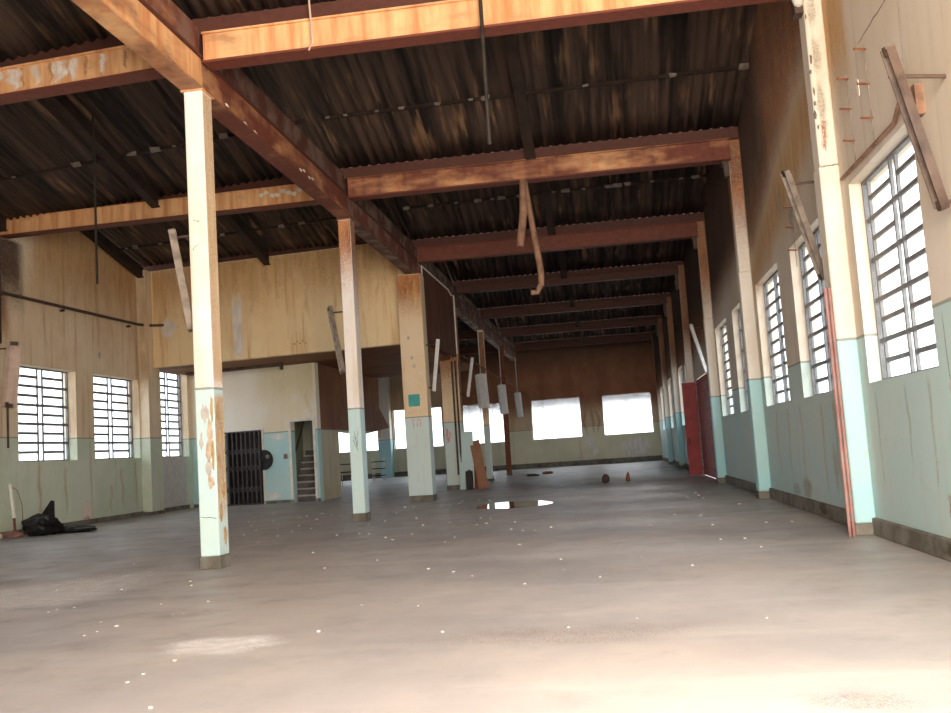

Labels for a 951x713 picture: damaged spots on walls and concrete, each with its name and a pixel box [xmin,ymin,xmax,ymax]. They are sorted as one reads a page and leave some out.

peeling [0,54,108,92]
peeling [199,395,215,489]